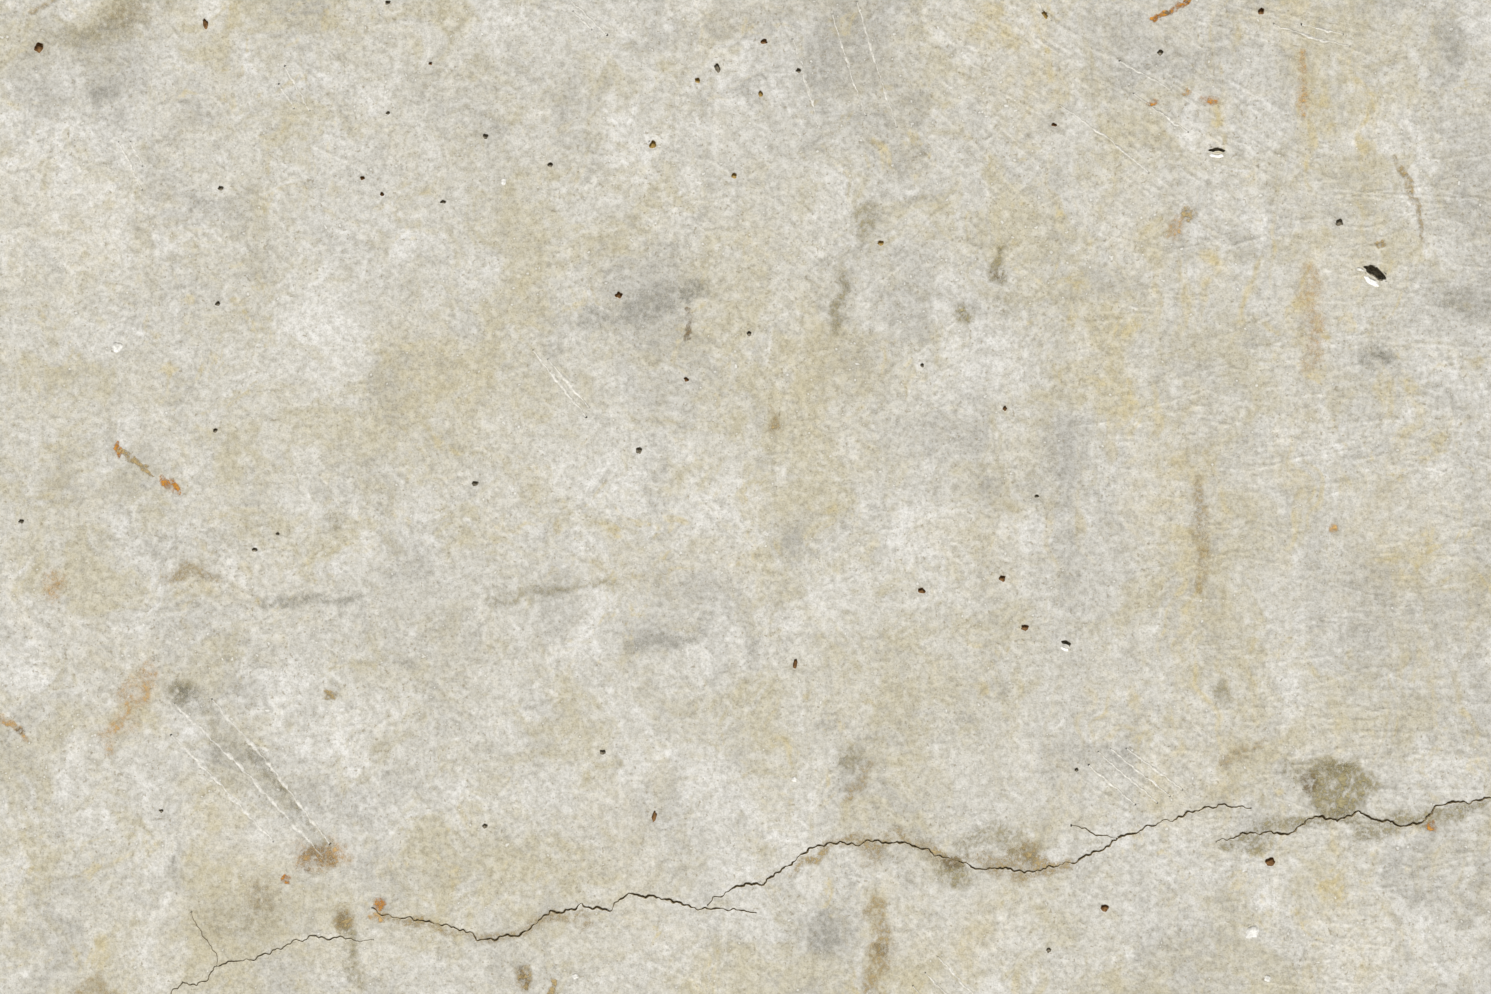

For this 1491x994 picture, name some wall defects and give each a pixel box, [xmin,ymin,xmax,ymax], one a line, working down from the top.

rust [1150,0,1191,22]
rust [113,441,181,493]
water stain [1304,757,1379,818]
crack [169,795,1491,994]